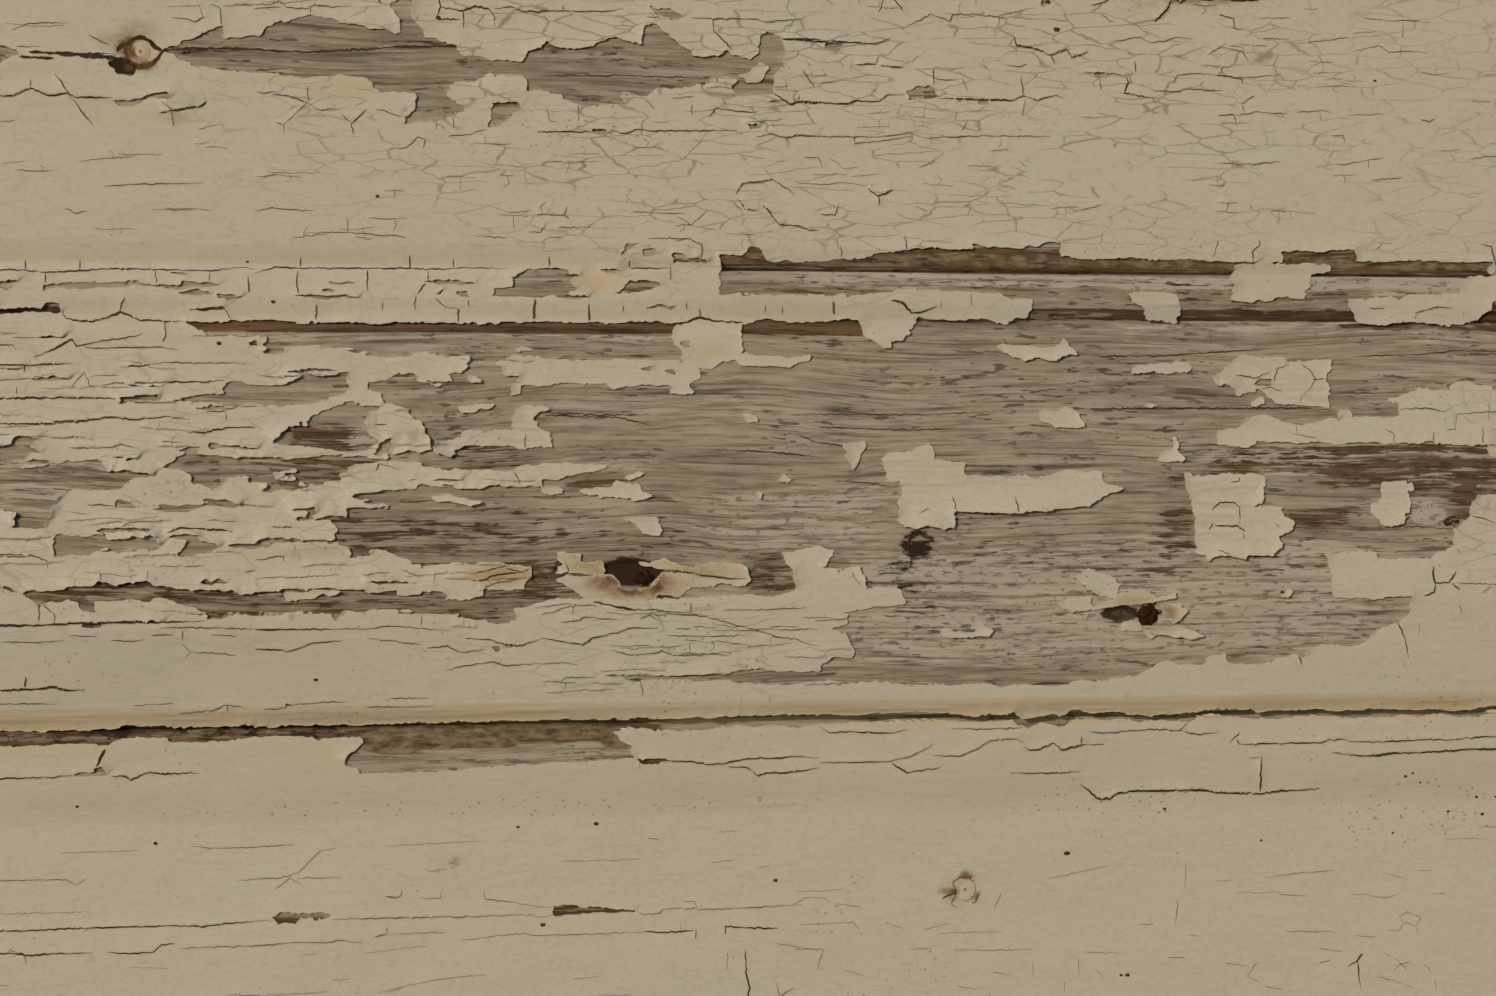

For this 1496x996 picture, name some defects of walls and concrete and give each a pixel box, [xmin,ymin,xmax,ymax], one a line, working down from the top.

peeling [163,0,787,127]
crack [0,0,1437,449]
peeling [0,242,1496,688]
rust [578,562,663,596]
crack [0,750,197,781]
peeling [340,731,670,774]
crack [0,841,1115,996]
crack [1138,863,1445,988]